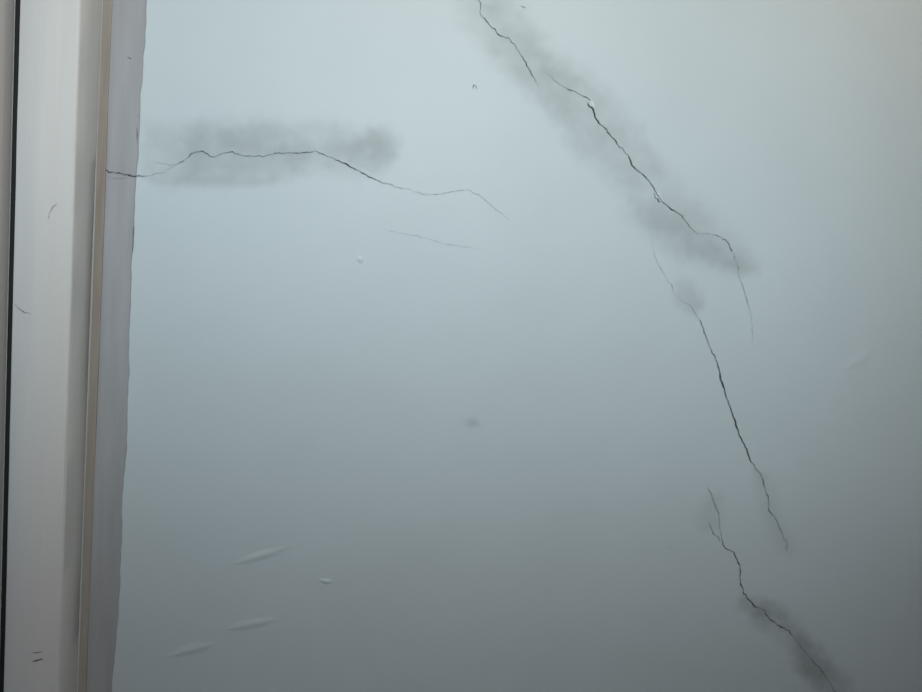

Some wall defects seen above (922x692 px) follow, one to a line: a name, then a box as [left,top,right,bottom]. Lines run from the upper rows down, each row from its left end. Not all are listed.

crack [106,170,140,179]
crack [568,89,688,224]
crack [700,321,764,483]
crack [713,533,790,633]